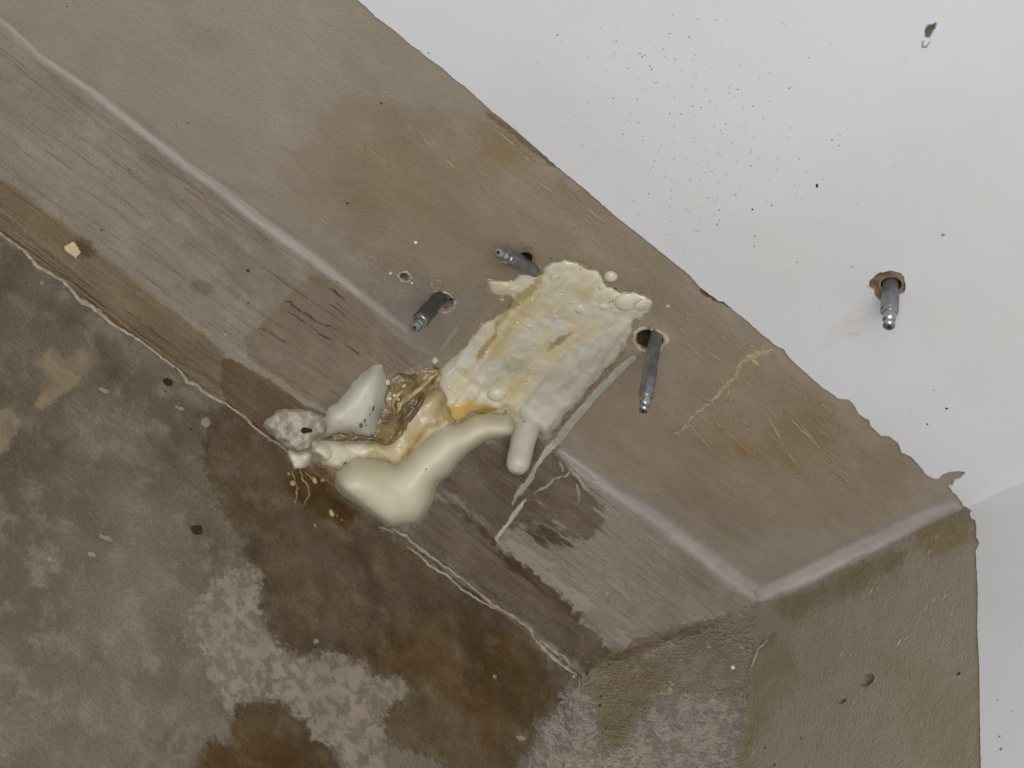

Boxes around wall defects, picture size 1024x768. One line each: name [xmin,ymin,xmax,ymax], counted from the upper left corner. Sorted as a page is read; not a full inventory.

crack [0,232,288,453]
crack [285,282,358,354]
efflorescence [121,560,408,768]
crack [379,527,580,768]
water stain [497,537,637,648]